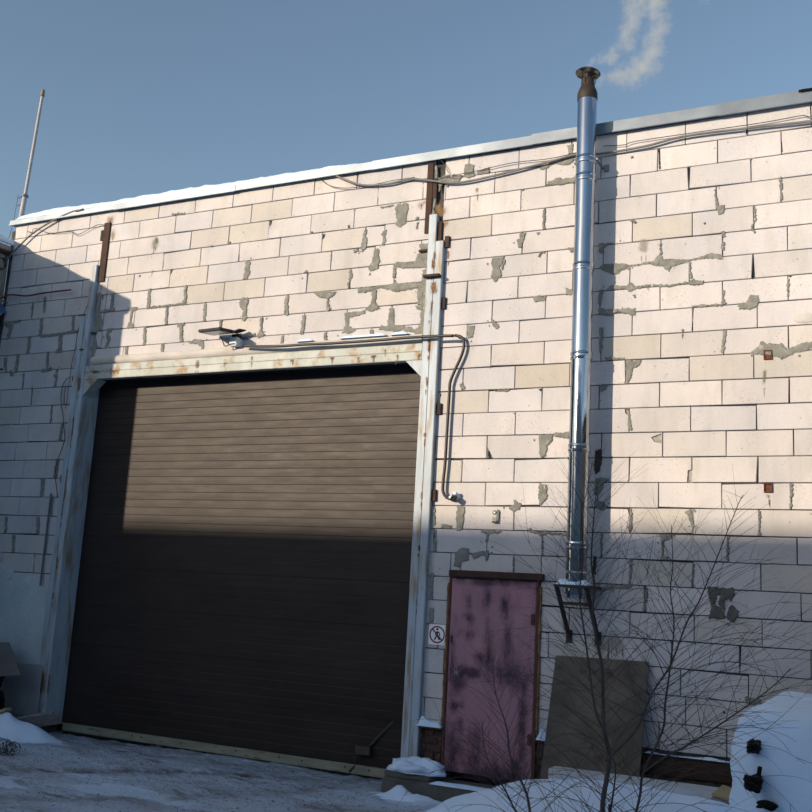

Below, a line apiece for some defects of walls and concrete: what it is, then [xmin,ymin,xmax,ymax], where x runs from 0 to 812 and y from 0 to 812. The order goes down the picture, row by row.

peeling [718,587,740,627]